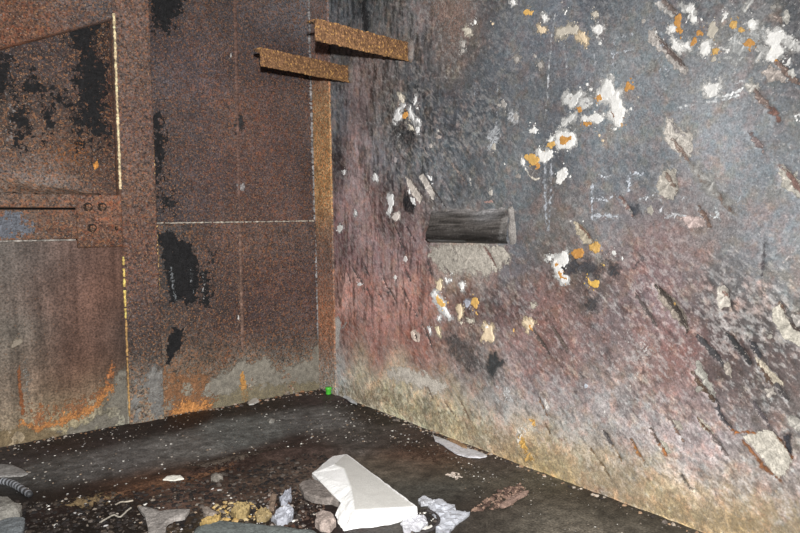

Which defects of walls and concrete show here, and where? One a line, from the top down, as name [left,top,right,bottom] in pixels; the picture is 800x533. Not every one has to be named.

peeling [640,0,800,122]
rust [39,137,99,175]
peeling [390,91,422,164]
spalling [386,174,446,222]
peeling [515,73,639,180]
spalling [342,243,512,347]
peeling [544,220,623,286]
rust [17,358,117,434]
rust [163,362,220,416]
damp [341,363,800,533]
spalling [691,360,800,482]
spalling [725,301,800,400]